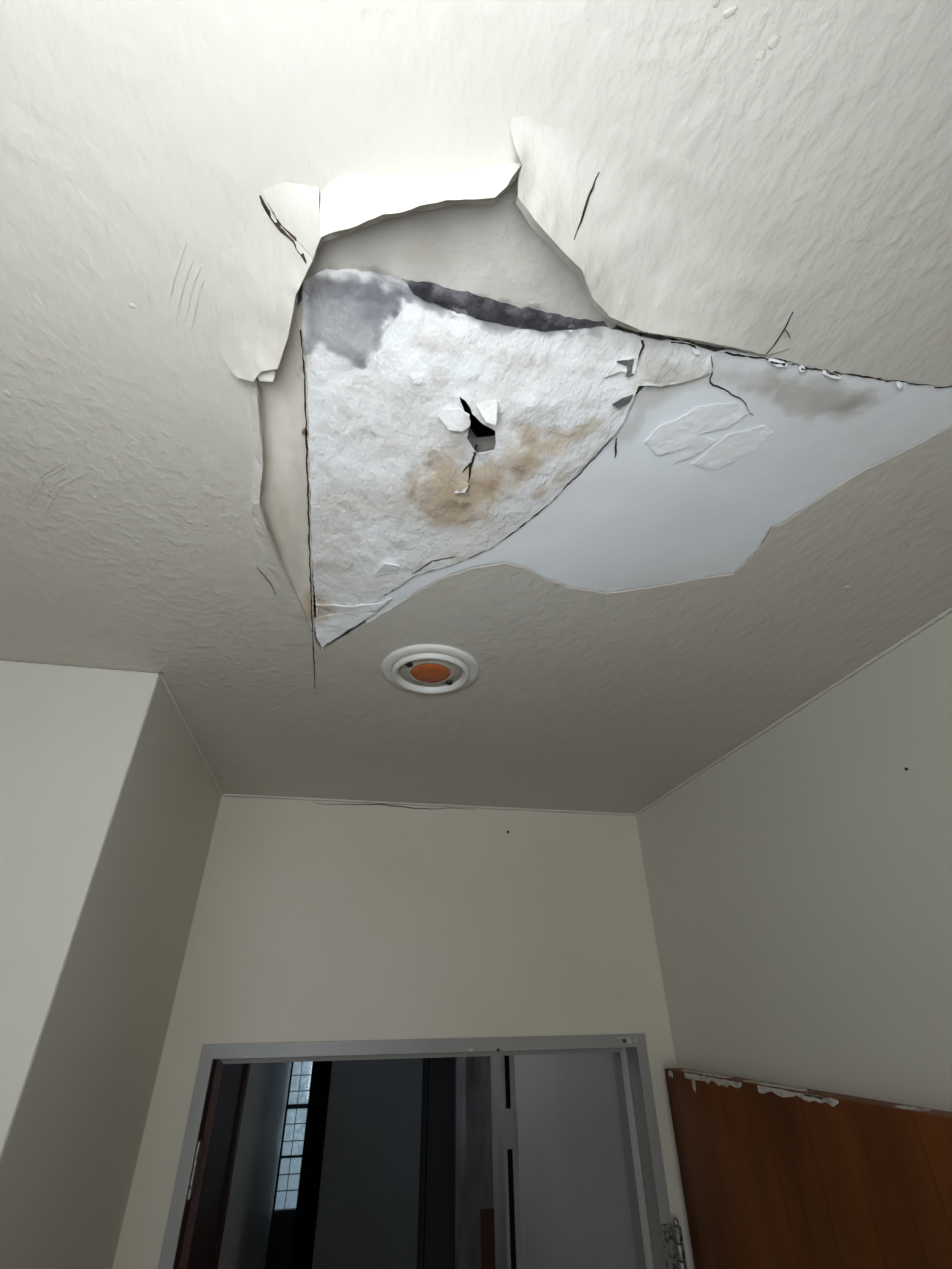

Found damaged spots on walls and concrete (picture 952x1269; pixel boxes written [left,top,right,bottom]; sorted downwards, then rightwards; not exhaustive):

crack [300,330,315,685]
spalling [249,163,952,647]
peeling [668,1070,742,1092]
peeling [757,1085,838,1107]